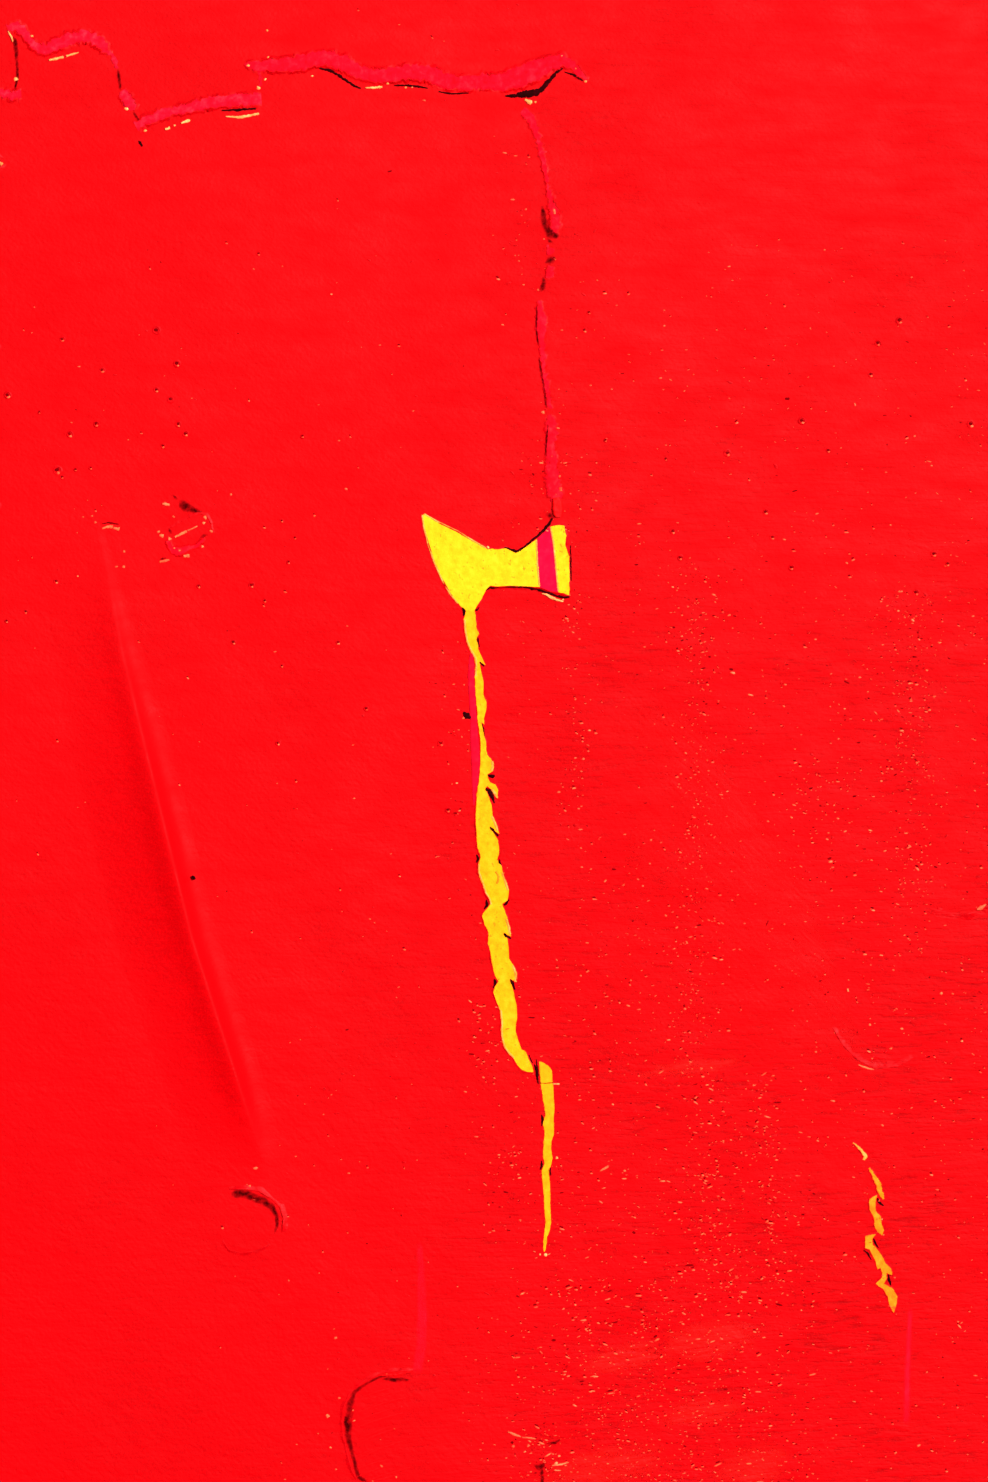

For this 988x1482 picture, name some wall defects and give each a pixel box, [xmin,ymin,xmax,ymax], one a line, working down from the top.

crack [0,19,590,517]
peeling [422,513,572,1256]